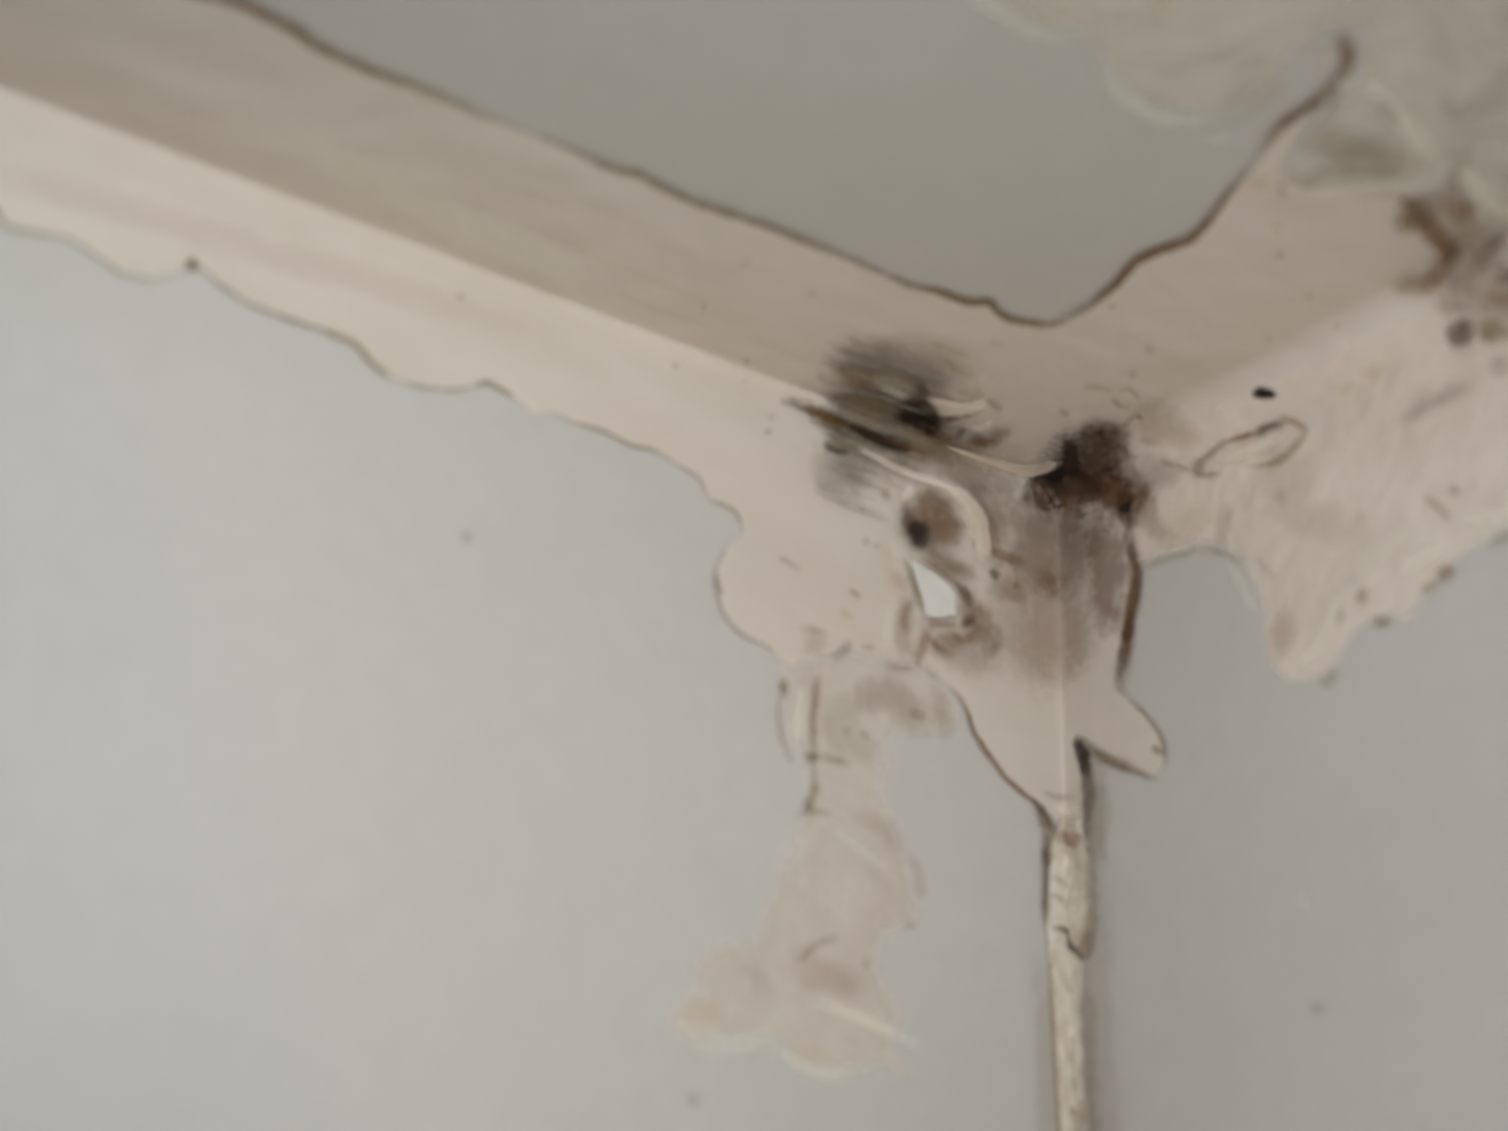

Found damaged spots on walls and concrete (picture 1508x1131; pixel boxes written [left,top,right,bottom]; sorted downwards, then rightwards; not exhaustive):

peeling [0,0,1450,822]
water stain [802,406,908,451]
water stain [901,389,995,447]
water stain [1033,425,1132,522]
crack [1045,816,1094,1131]